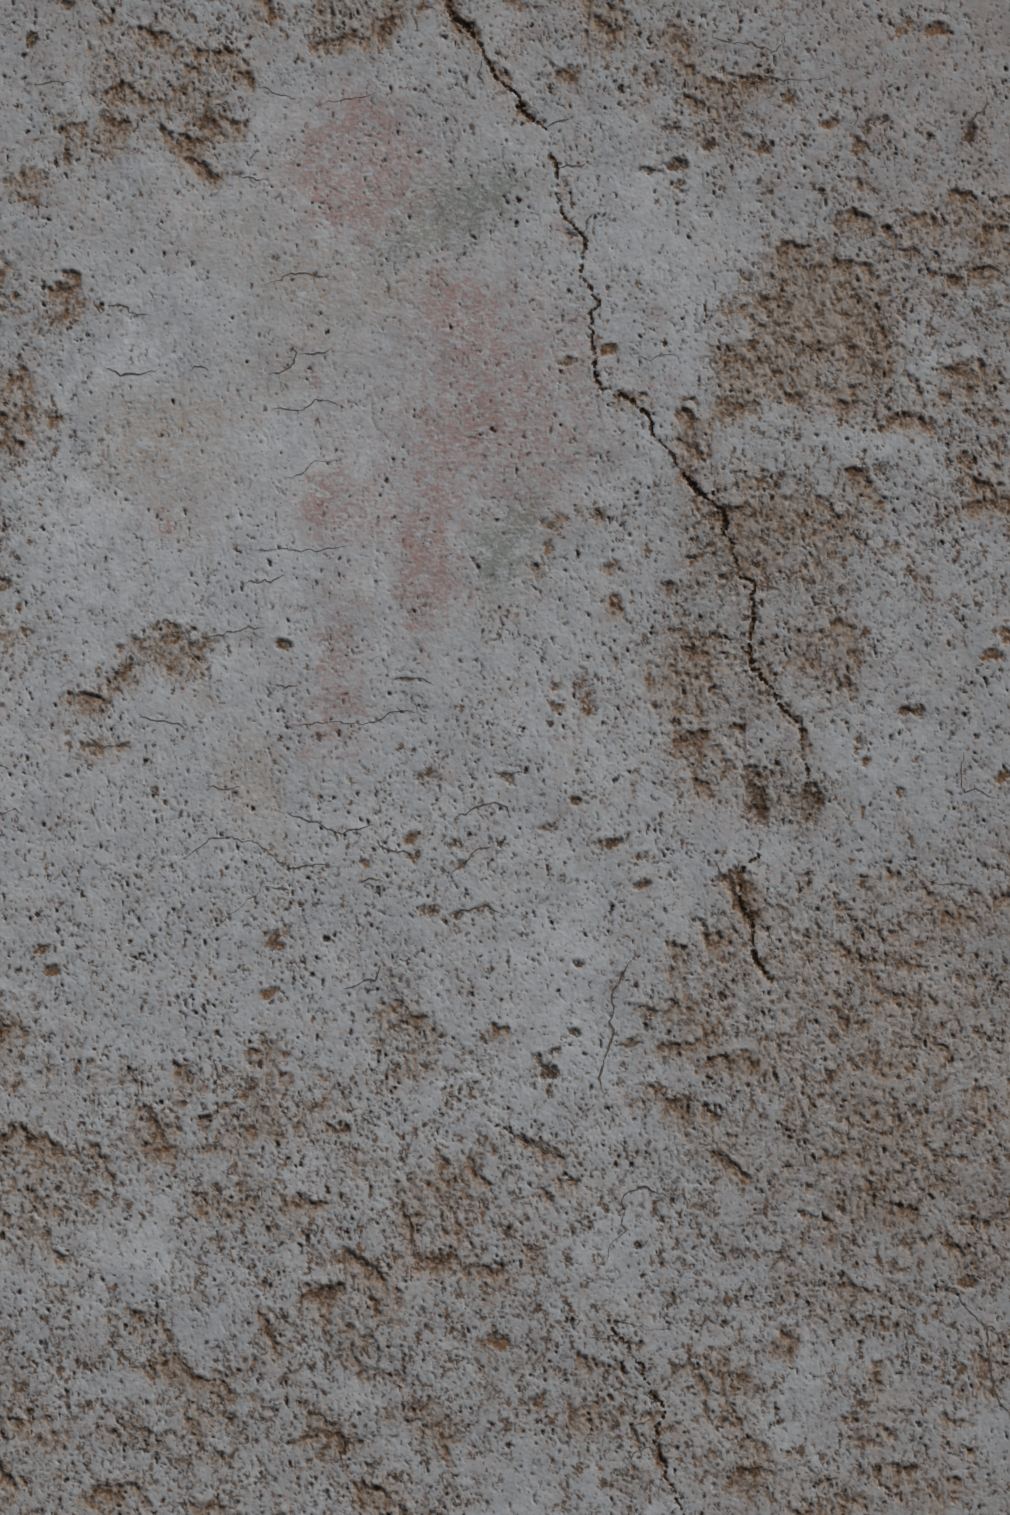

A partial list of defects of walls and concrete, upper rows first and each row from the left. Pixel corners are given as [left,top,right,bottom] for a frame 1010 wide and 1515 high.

spalling [0,0,408,209]
crack [406,0,827,779]
spalling [669,115,1010,546]
spalling [58,621,226,763]
spalling [370,962,582,1113]
crack [450,904,503,915]
crack [451,771,532,874]
spalling [611,580,832,845]
crack [695,852,779,991]
spalling [724,459,924,712]
spalling [0,991,583,1515]
spalling [530,846,1010,1515]